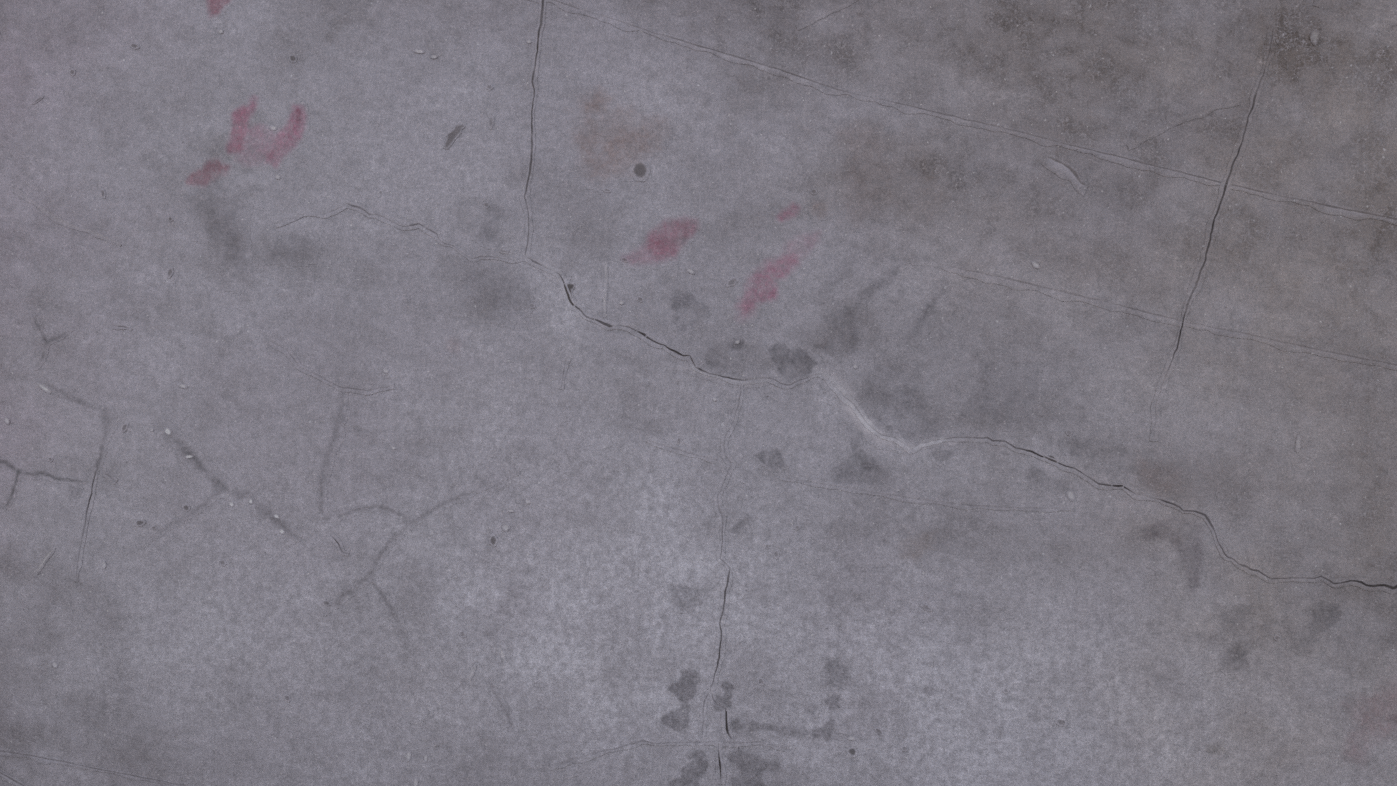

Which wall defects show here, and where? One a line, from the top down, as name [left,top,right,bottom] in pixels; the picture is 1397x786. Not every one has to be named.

crack [0,312,520,658]
crack [274,0,1397,754]
crack [714,739,726,784]
damp [658,653,856,786]